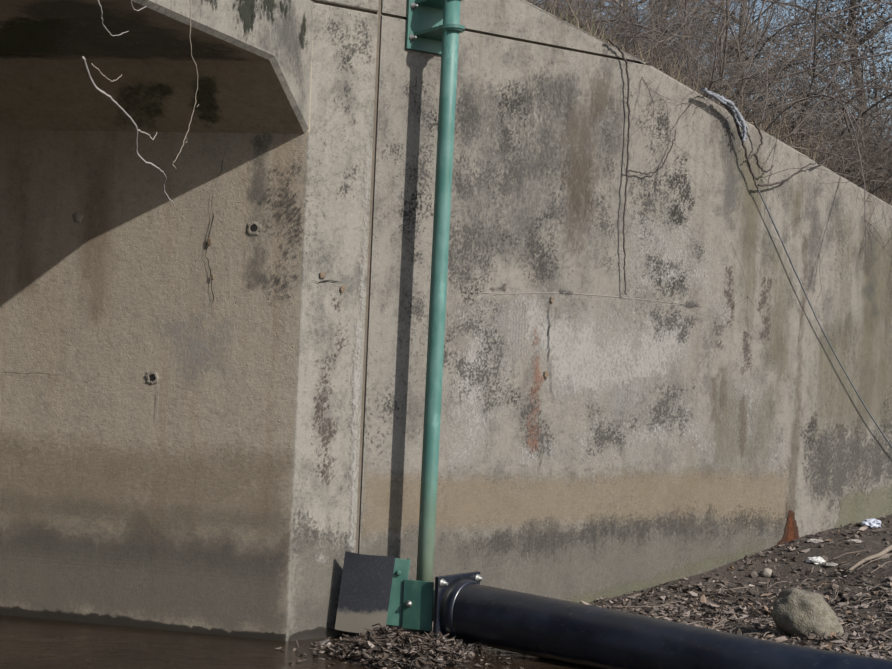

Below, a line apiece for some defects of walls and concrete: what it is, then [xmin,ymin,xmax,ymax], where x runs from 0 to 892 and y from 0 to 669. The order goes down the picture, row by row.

crack [205,154,225,319]
leakage [382,81,438,268]
crack [544,297,554,394]
leakage [433,75,800,603]
leakage [0,317,362,659]
leakage [366,480,421,580]